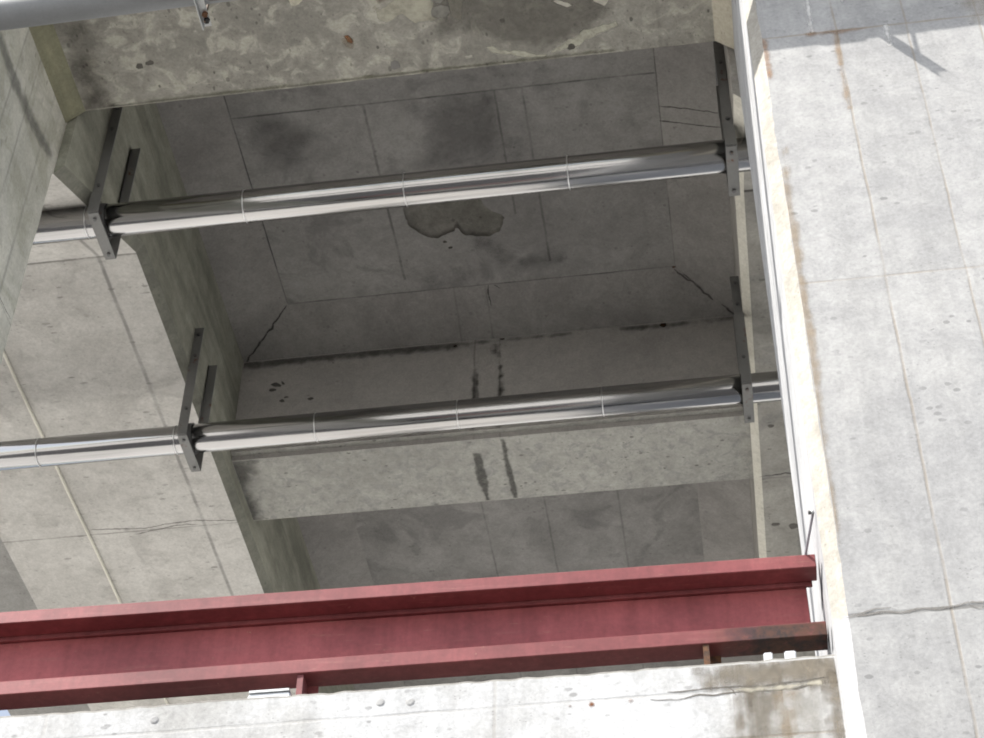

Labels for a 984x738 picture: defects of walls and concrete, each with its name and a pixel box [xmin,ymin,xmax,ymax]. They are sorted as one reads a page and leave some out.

damp [441,0,618,57]
damp [474,454,489,500]
damp [503,440,517,498]
crack [847,601,984,618]
crack [650,677,826,701]
damp [708,658,846,738]